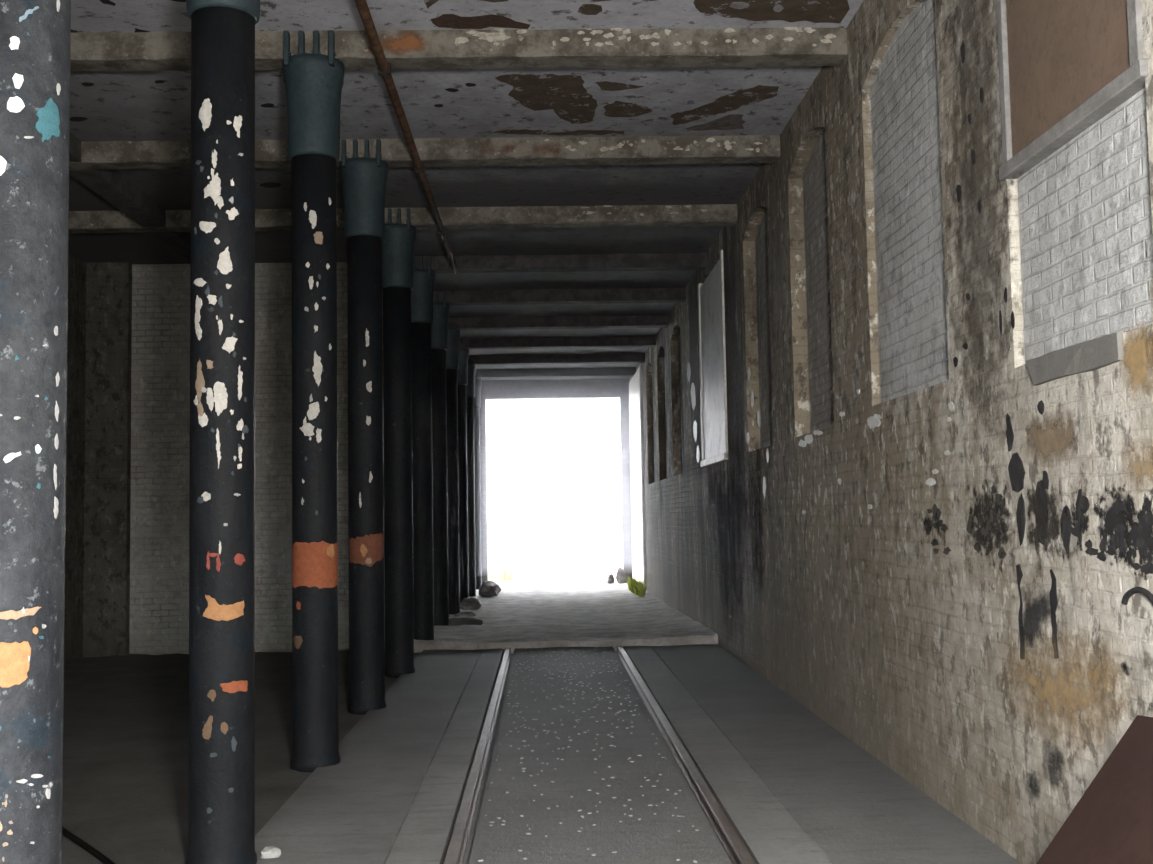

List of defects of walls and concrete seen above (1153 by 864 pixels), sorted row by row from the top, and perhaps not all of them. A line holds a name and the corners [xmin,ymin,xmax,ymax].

peeling [424,0,530,46]
peeling [693,0,850,47]
peeling [199,98,212,132]
peeling [226,115,242,138]
peeling [493,74,652,152]
peeling [304,202,323,244]
peeling [194,139,249,476]
peeling [300,344,332,443]
damp [1006,413,1072,553]
peeling [203,594,245,621]
peeling [292,533,384,610]
peeling [0,606,46,688]